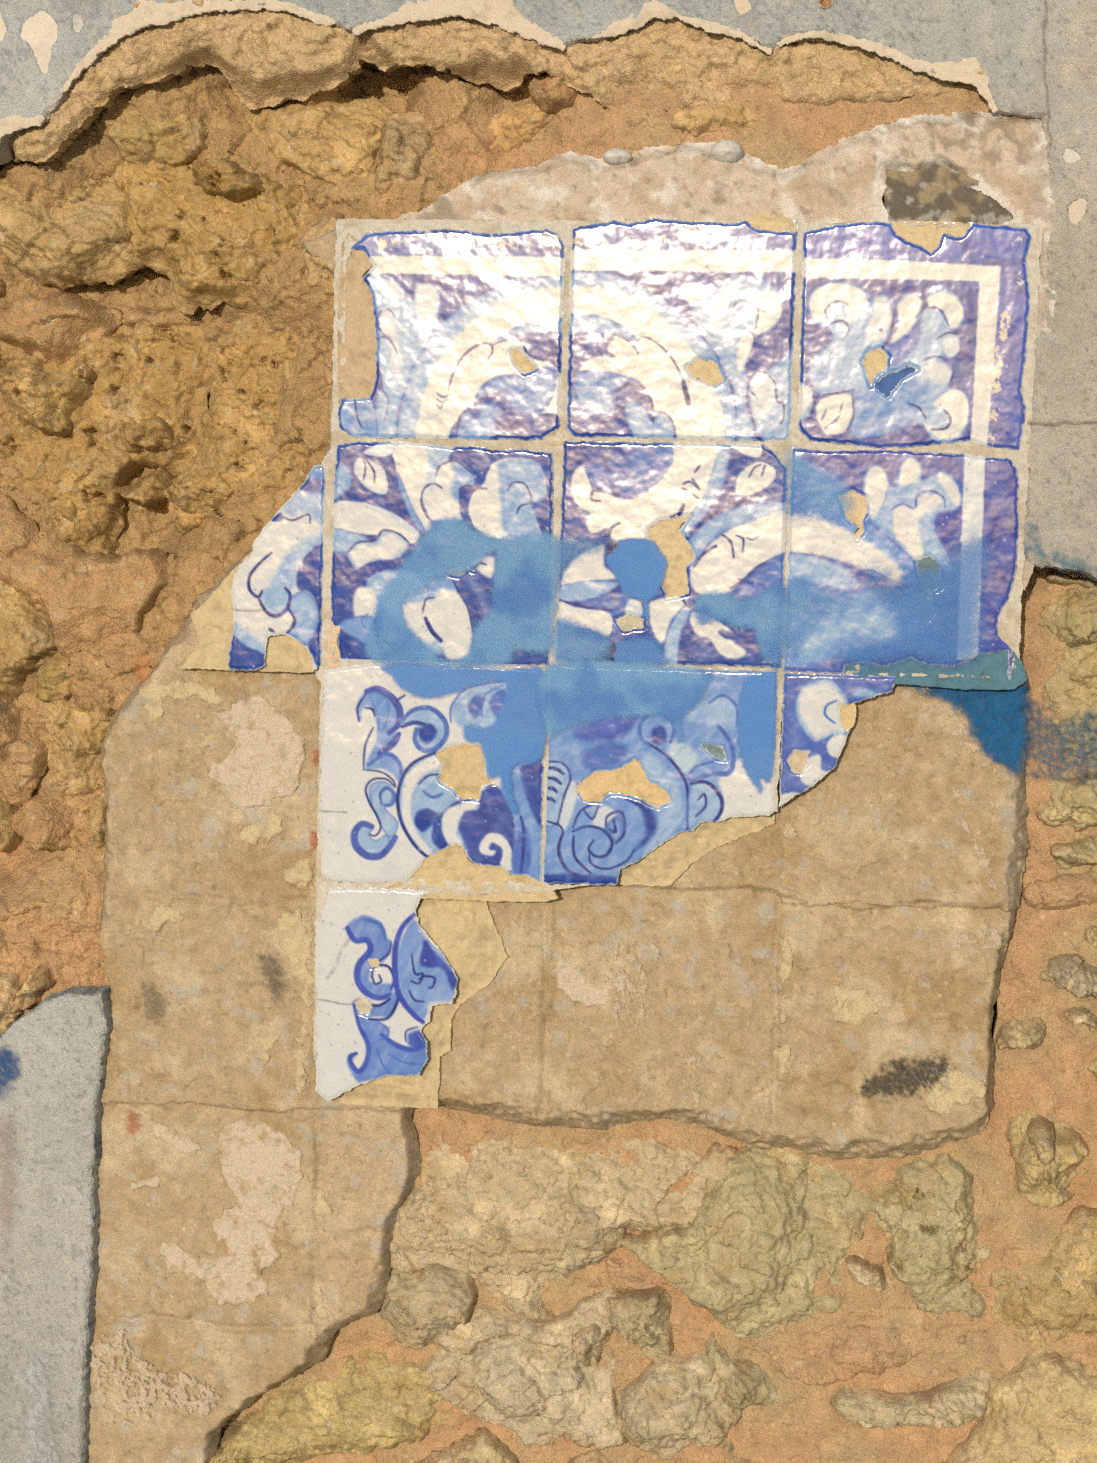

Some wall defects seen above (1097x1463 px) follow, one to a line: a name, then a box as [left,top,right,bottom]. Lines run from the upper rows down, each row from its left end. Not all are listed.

peeling [1063,149,1081,163]
peeling [1069,198,1087,225]
spalling [0,0,1013,1035]
spalling [209,567,1097,1463]
peeling [152,1118,333,1306]
peeling [91,1330,220,1425]